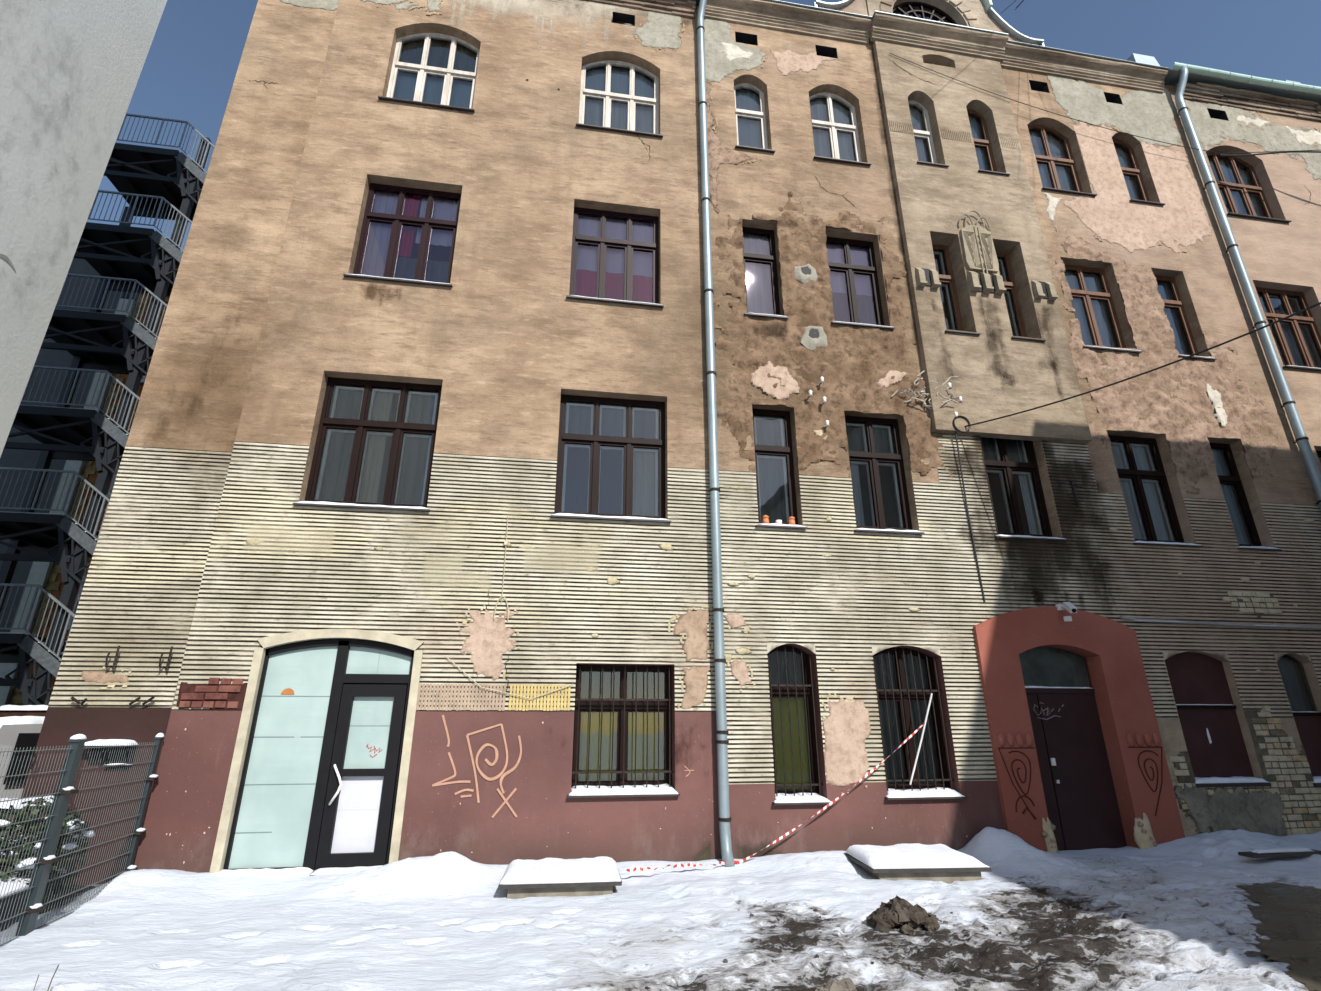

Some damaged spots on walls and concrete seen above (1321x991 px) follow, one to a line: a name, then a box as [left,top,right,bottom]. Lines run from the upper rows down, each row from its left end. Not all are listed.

flaking render [280,0,339,11]
flaking render [360,0,442,15]
flaking render [631,11,953,477]
flaking render [1044,74,1321,493]
flaking render [176,678,248,710]
flaking render [456,604,520,681]
flaking render [668,605,755,710]
flaking render [821,693,872,788]
flaking render [1169,706,1321,835]
flaking render [1222,591,1282,617]